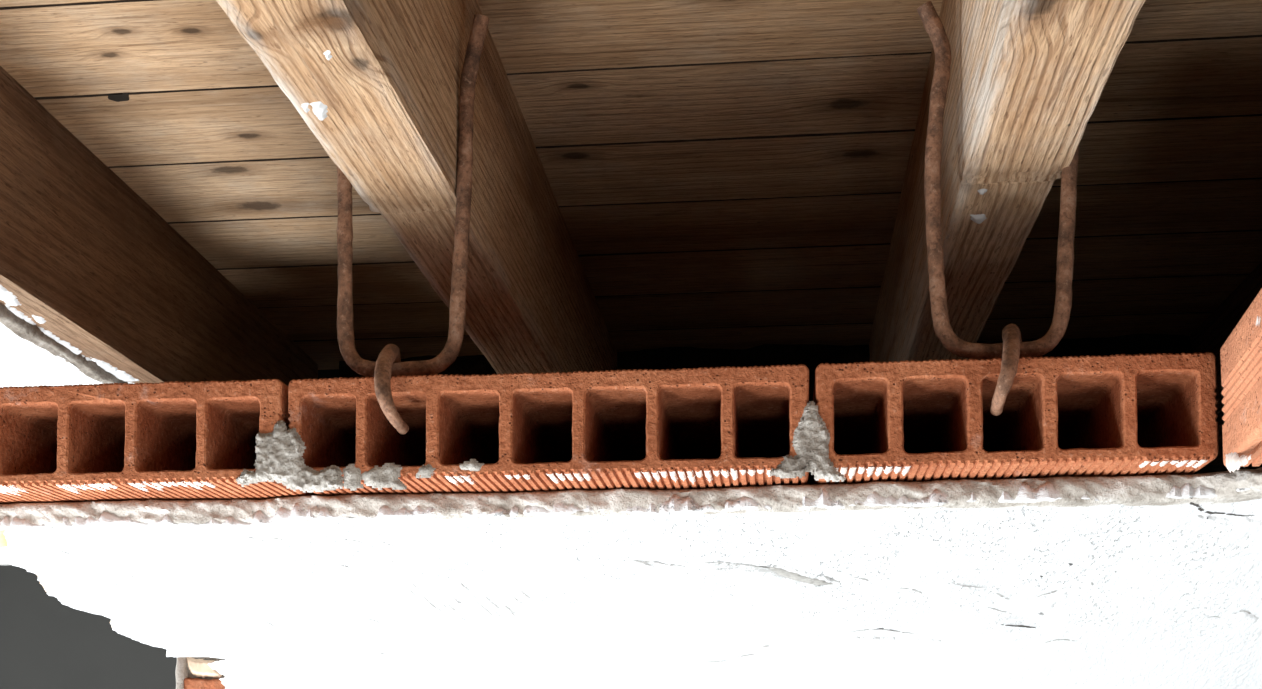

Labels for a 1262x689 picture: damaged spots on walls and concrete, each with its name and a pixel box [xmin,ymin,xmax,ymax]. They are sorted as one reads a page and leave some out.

spalling [32,569,59,592]
flaking render [176,657,226,689]